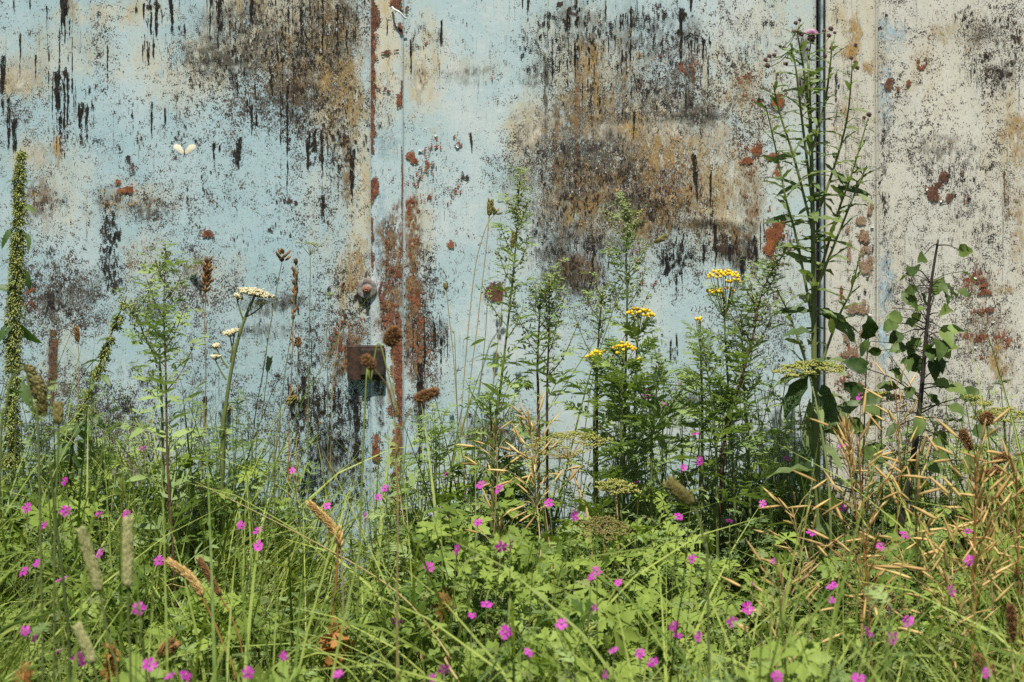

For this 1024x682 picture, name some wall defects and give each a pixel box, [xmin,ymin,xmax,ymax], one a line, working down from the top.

water stain [0,0,108,157]
water stain [206,0,231,48]
water stain [212,0,365,191]
water stain [305,128,368,206]
corrosion [318,0,403,154]
water stain [513,0,777,299]
corrosion [563,49,793,298]
corrosion [313,147,459,527]